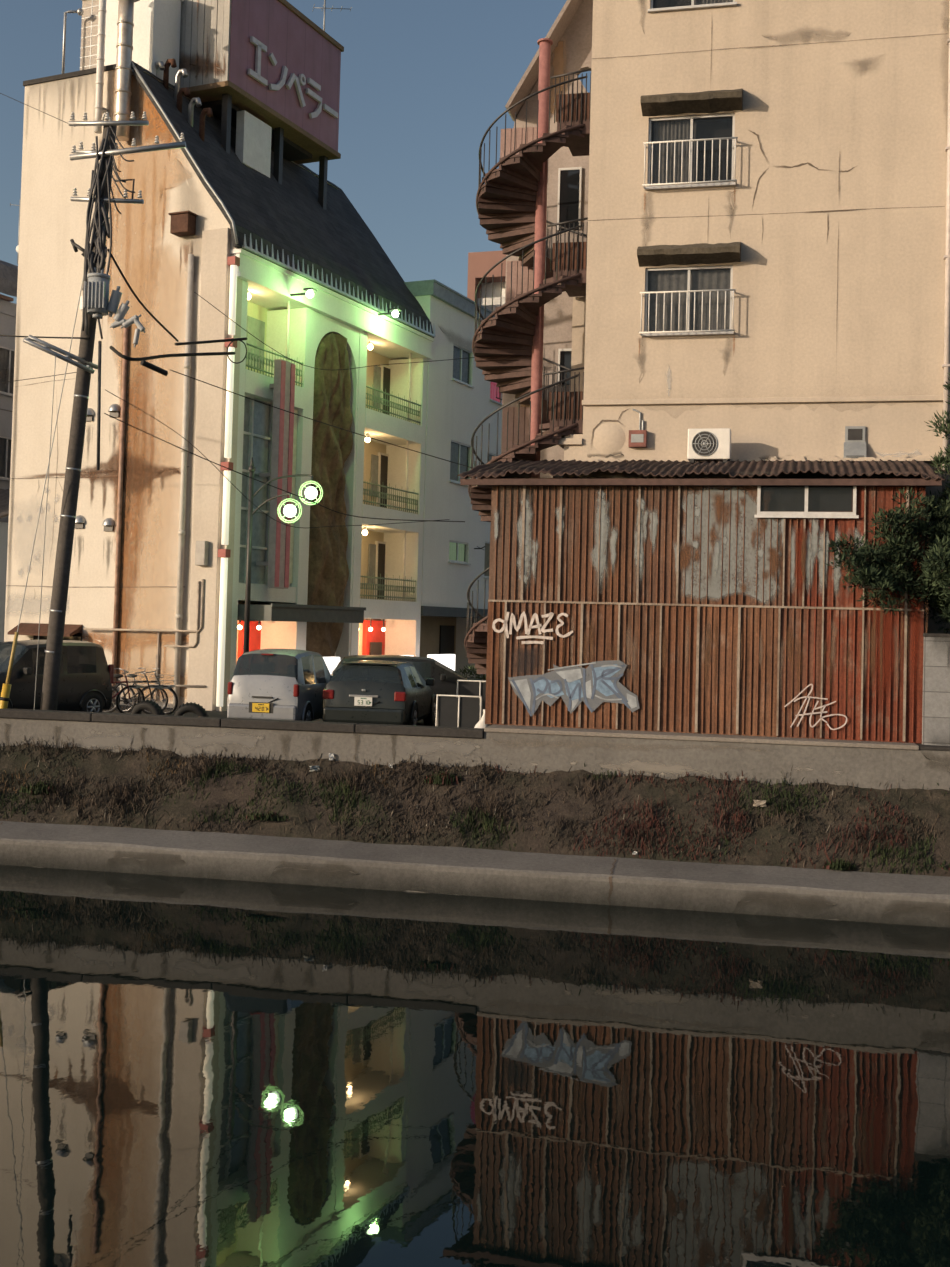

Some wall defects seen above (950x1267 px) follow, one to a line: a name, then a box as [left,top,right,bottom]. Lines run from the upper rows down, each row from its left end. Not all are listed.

crack [588,131,945,300]
corrosion [80,64,189,697]
crack [592,410,626,440]
peeling [517,498,532,583]
peeling [592,490,609,578]
peeling [635,499,645,575]
peeling [679,487,851,603]
corrosion [795,532,806,588]
corrosion [845,521,928,697]